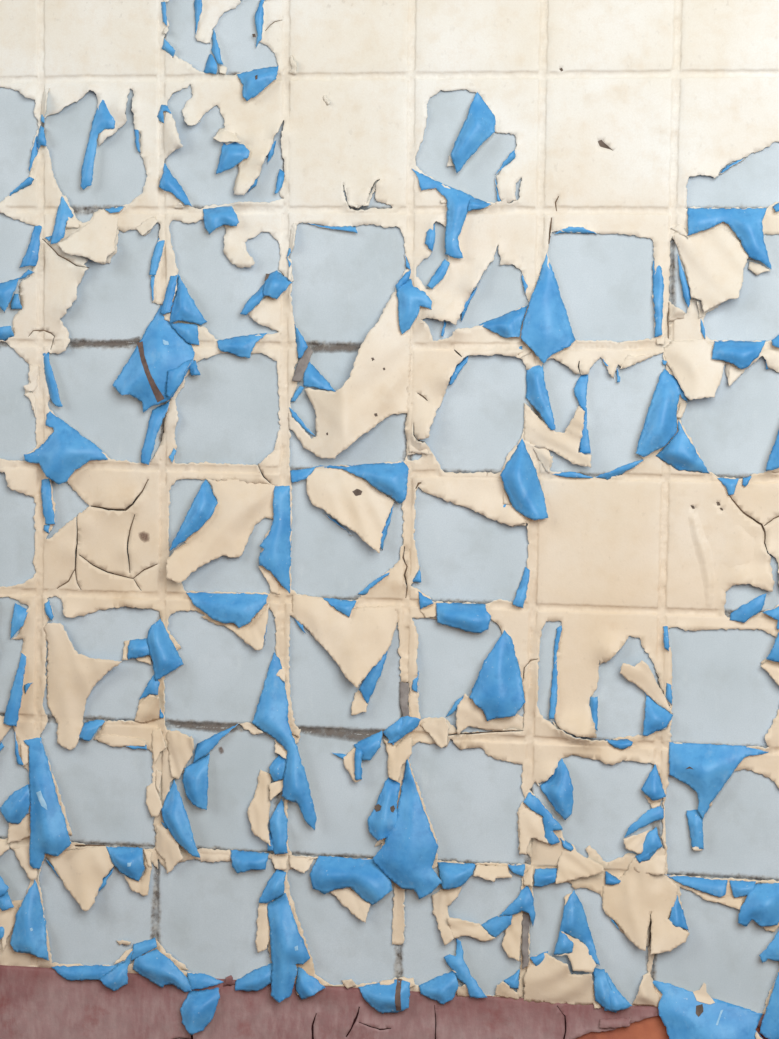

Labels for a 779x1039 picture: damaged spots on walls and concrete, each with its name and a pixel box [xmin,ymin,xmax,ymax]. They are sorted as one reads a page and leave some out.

peeling [161,0,297,101]
peeling [411,89,517,289]
peeling [418,142,779,520]
crack [57,479,157,591]
peeling [0,85,432,1035]
crack [729,495,779,553]
peeling [158,482,779,1039]
crack [346,1007,390,1037]